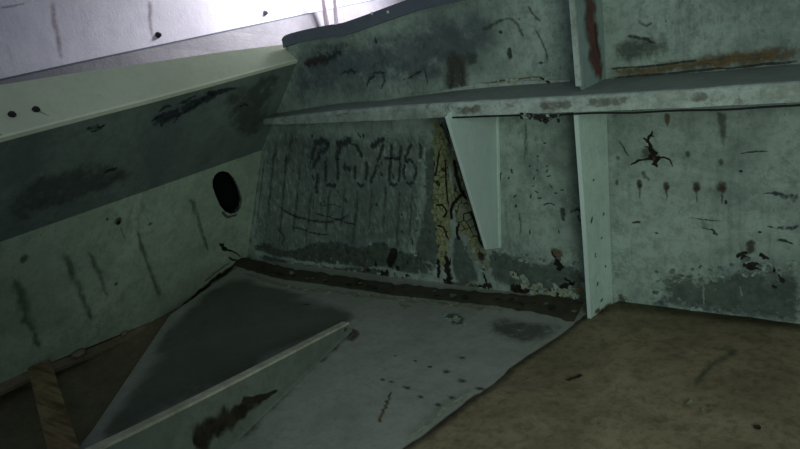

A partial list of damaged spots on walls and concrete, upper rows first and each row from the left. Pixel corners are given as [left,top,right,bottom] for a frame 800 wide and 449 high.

corrosion [585,0,602,77]
corrosion [612,48,796,78]
crack [619,131,673,167]
peeling [255,120,584,289]
peeling [650,241,799,321]